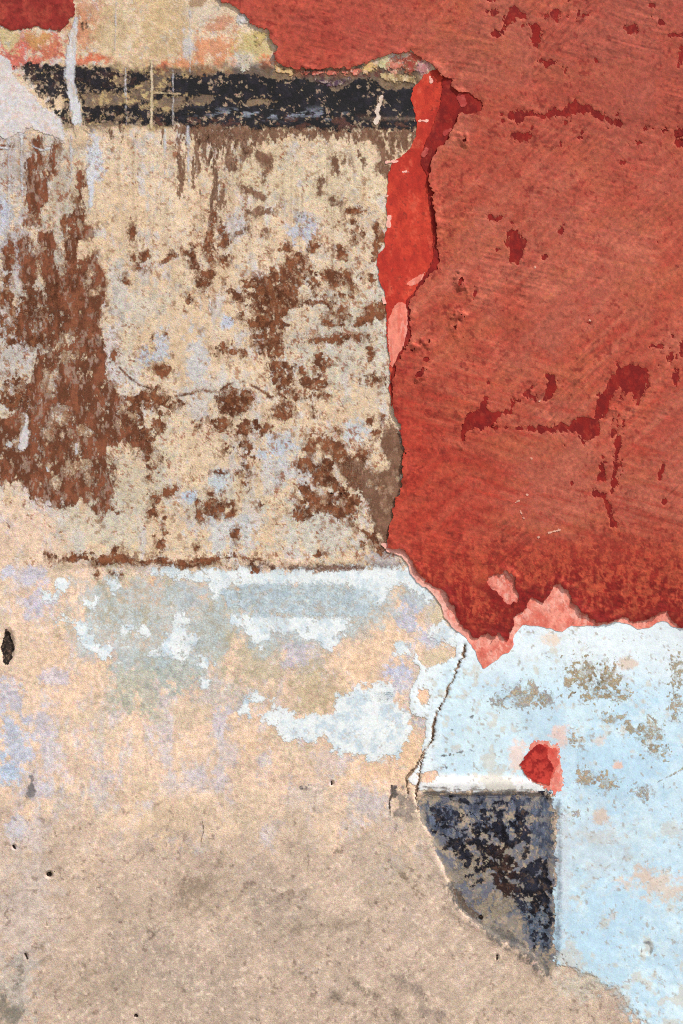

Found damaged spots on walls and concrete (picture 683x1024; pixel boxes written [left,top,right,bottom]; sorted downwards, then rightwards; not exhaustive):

peeling [485,0,589,74]
peeling [500,99,623,143]
peeling [275,53,483,406]
peeling [487,214,527,265]
corrosion [0,135,387,579]
corrosion [291,414,406,556]
peeling [461,334,683,528]
crack [389,645,466,812]
peeling [427,619,456,651]
peeling [487,570,519,605]
peeling [487,644,683,768]
spalling [417,732,650,978]